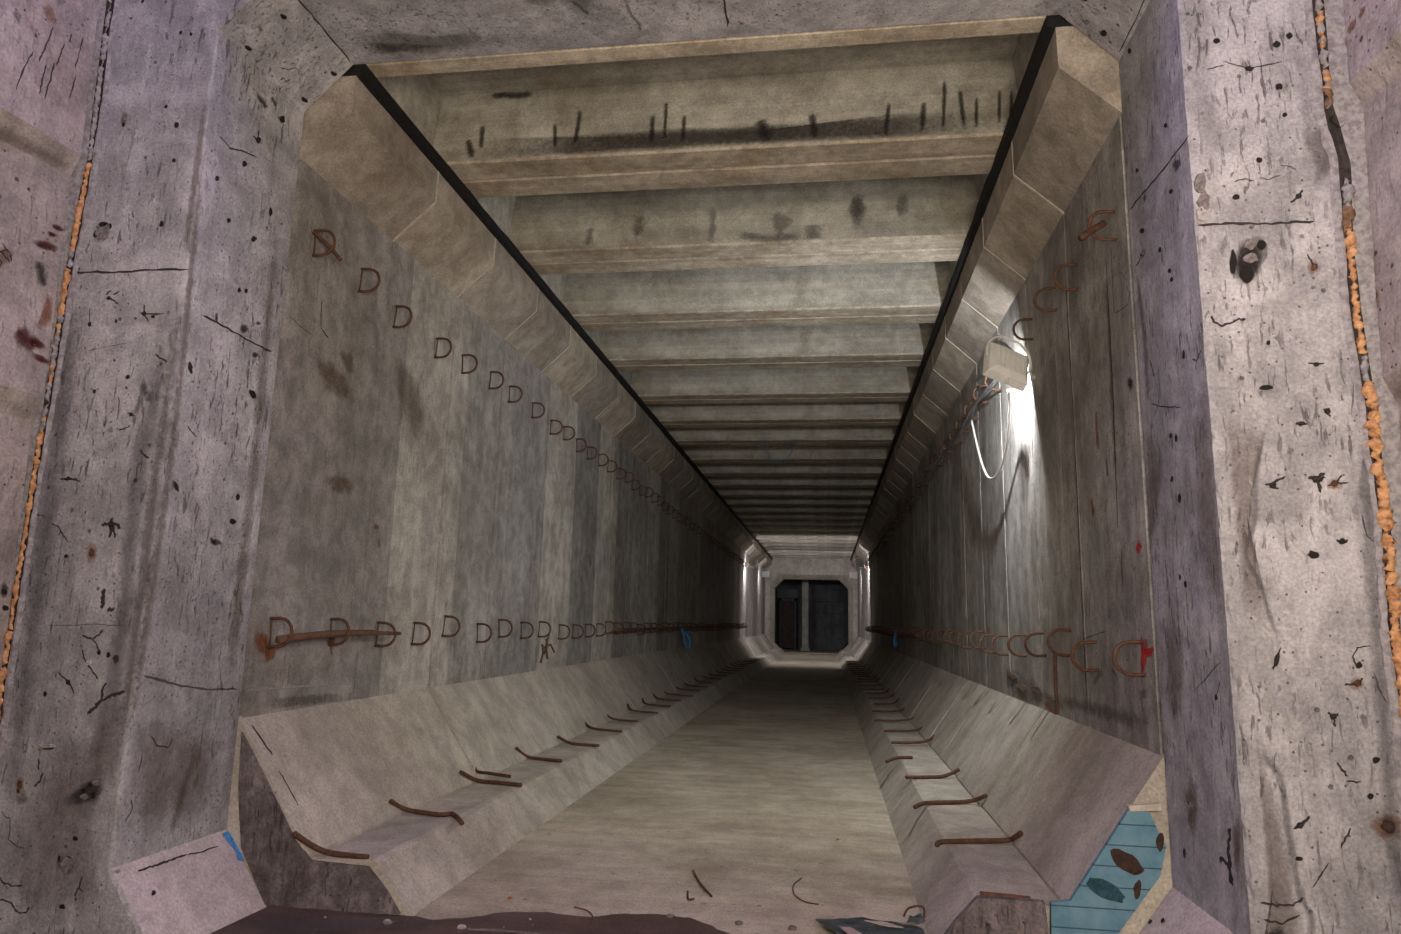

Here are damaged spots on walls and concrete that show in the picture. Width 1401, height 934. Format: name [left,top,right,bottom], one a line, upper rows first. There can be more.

crack [722,0,730,27]
rust [36,225,63,250]
spalling [1229,238,1266,283]